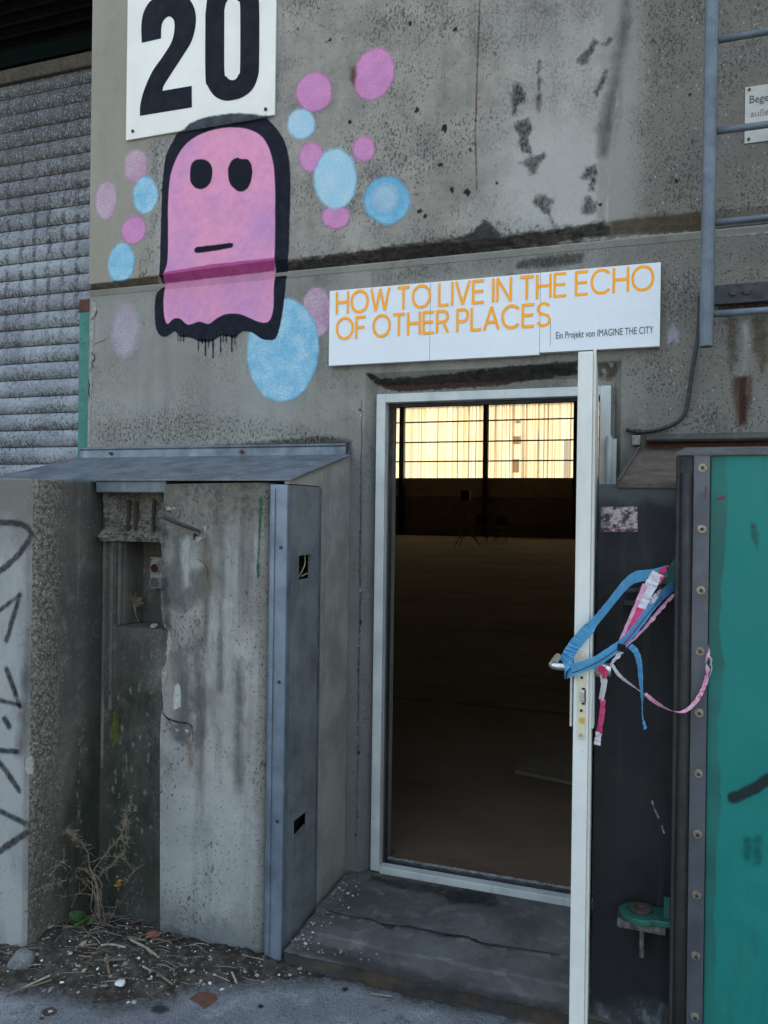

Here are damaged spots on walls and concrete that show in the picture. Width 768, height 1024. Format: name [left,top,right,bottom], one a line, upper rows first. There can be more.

water stain [581,38,612,64]
water stain [512,84,545,173]
water stain [288,166,701,271]
corrosion [734,378,751,424]
water stain [167,539,241,741]
crack [327,910,560,955]